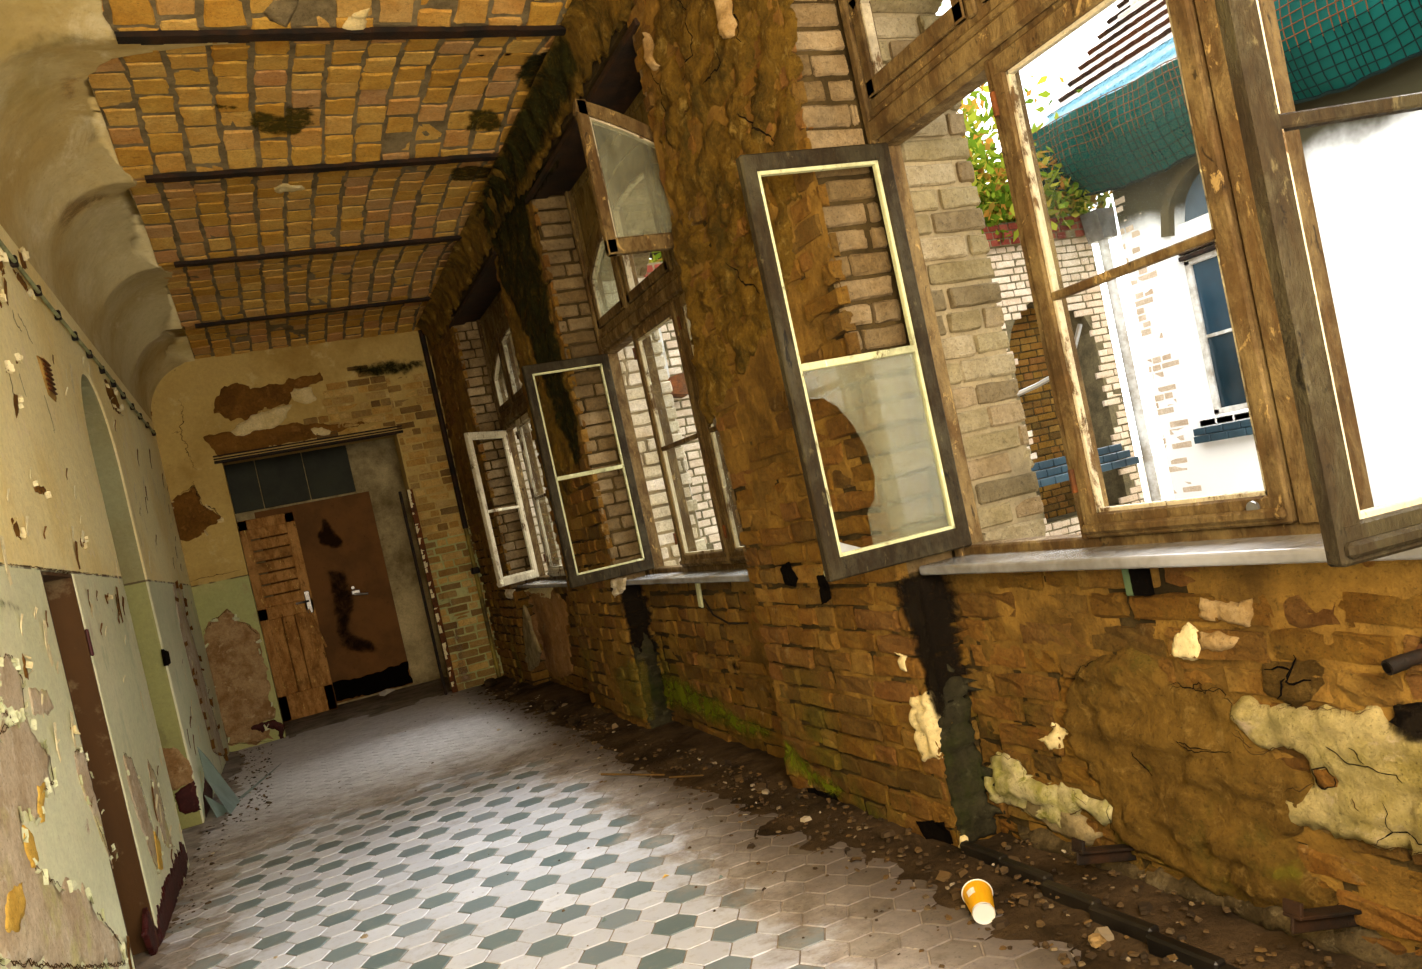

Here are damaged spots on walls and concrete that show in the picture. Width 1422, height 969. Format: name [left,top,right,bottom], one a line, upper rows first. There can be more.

damp [250,105,314,135]
flaking render [88,0,572,359]
peeling [4,353,23,374]
peeling [13,394,24,418]
flaking render [203,372,370,457]
flaking render [492,197,575,506]
peeling [11,517,26,540]
peeling [32,480,52,499]
flaking render [171,485,224,543]
flaking render [161,580,276,761]
peeling [1037,597,1339,909]
peeling [0,653,129,969]